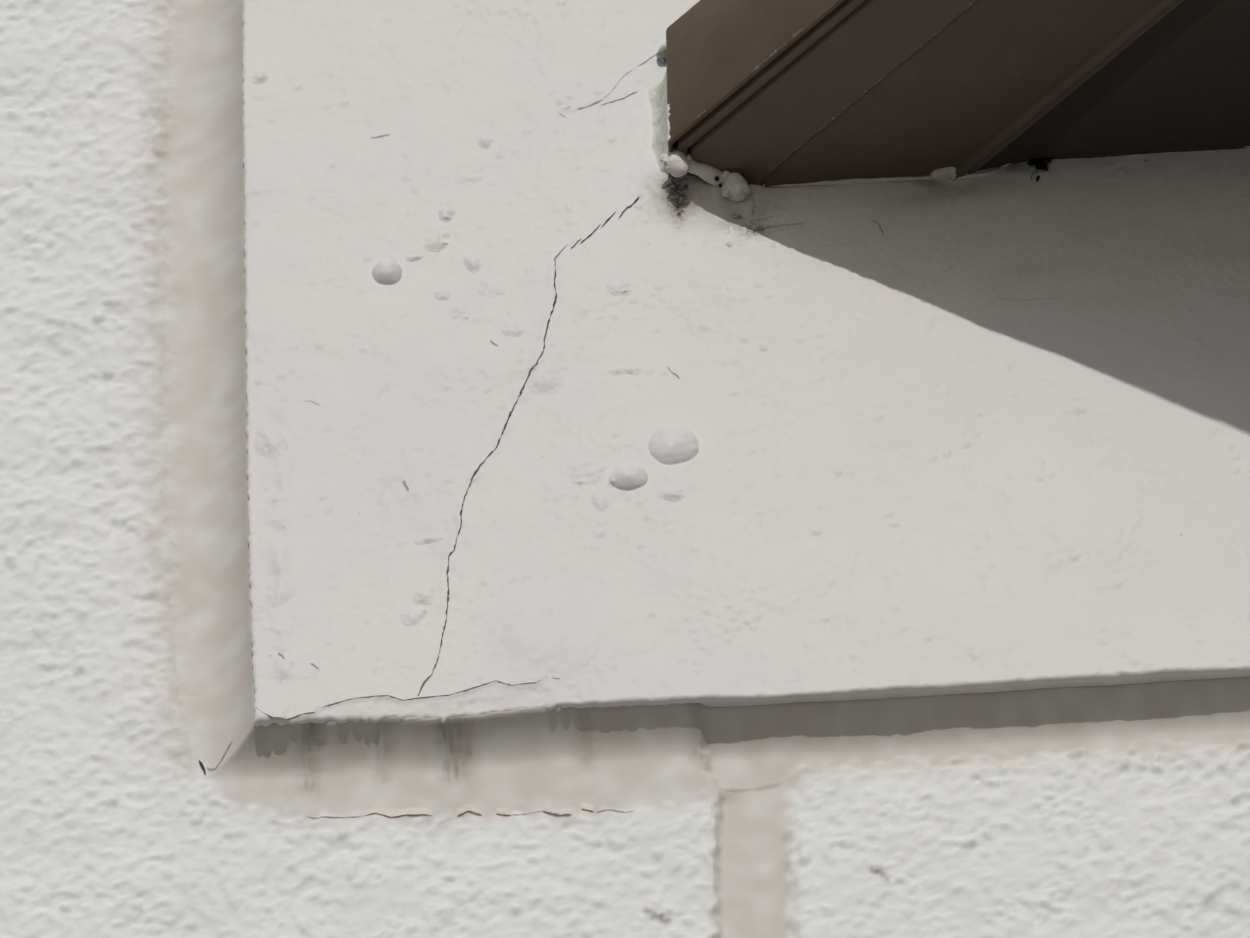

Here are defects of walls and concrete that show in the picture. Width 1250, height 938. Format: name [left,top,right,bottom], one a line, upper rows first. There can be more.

crack [418,197,639,696]